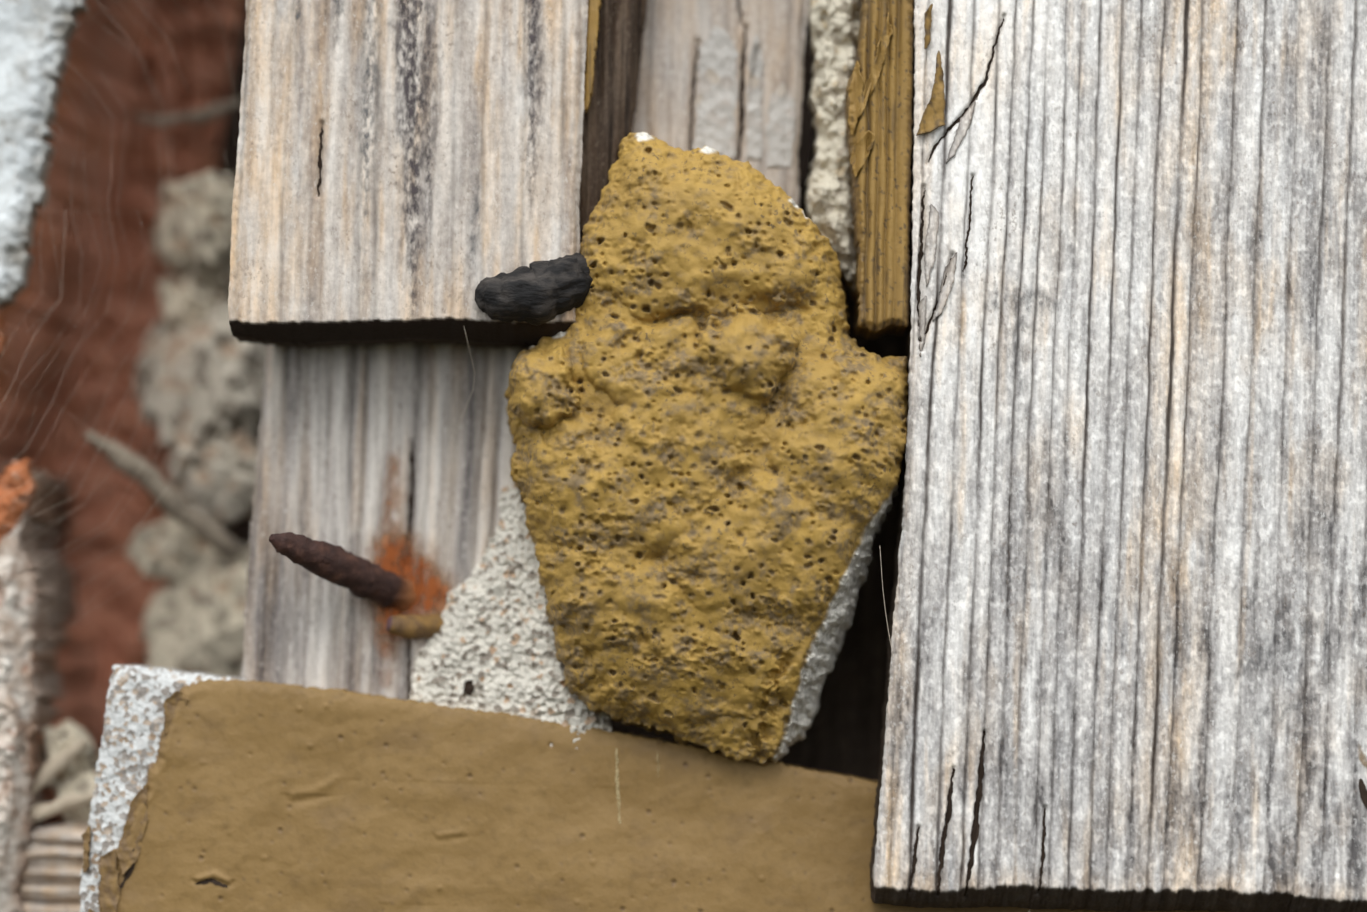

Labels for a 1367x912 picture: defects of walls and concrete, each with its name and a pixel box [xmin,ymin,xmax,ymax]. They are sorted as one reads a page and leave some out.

peeling [847,12,893,178]
crack [916,18,1004,341]
spalling [0,458,36,541]
corrosion [374,458,450,654]
peeling [163,691,189,735]
peeling [82,783,148,912]